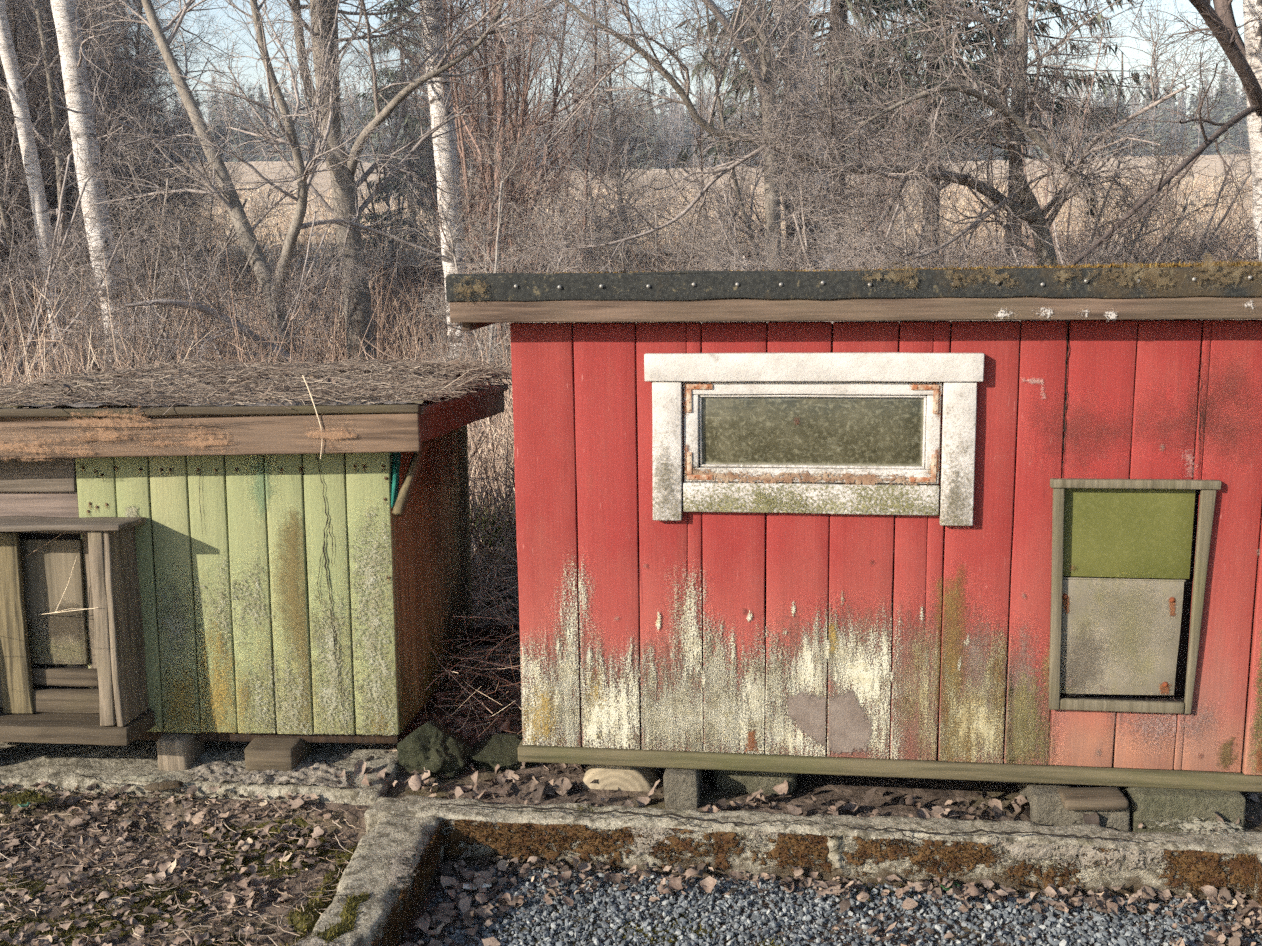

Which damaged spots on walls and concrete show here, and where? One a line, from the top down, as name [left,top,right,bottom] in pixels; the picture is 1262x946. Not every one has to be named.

damp [278,513,311,724]
crack [316,454,345,727]
peeling [520,556,1044,765]